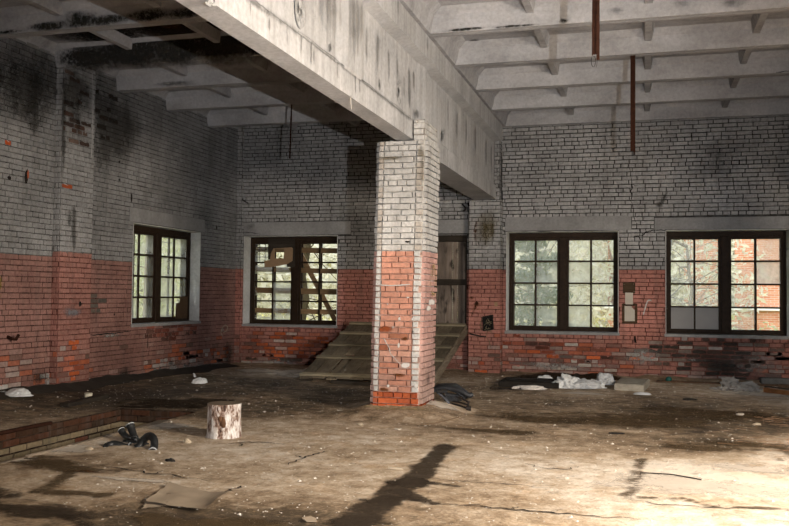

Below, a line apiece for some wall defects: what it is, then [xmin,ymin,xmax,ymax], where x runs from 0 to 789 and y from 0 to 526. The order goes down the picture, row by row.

damp [0,8,230,163]
peeling [502,334,789,380]
crack [456,499,789,520]